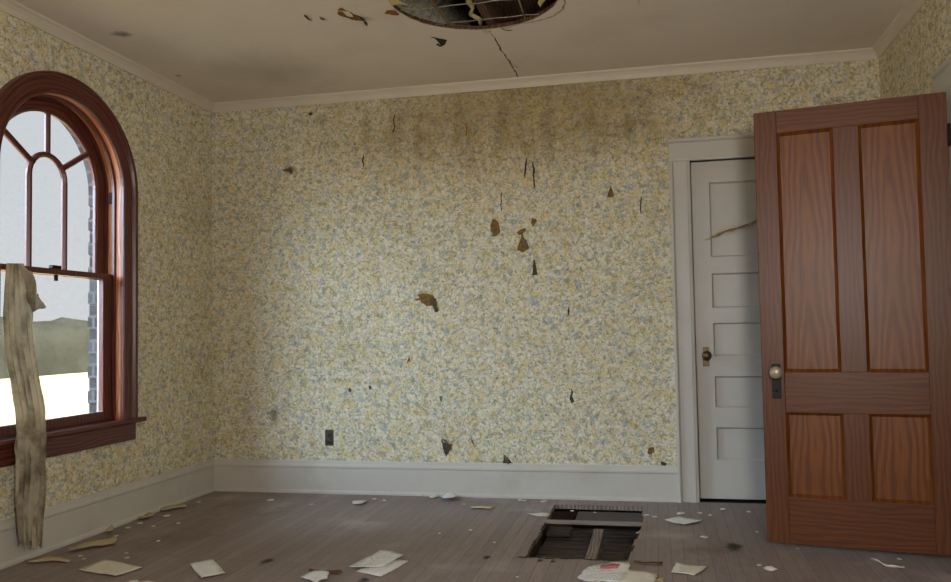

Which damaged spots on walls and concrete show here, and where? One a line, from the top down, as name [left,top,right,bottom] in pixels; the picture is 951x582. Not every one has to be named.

flaking render [337,8,368,27]
spalling [388,0,566,47]
crack [490,31,518,77]
crack [705,216,757,241]